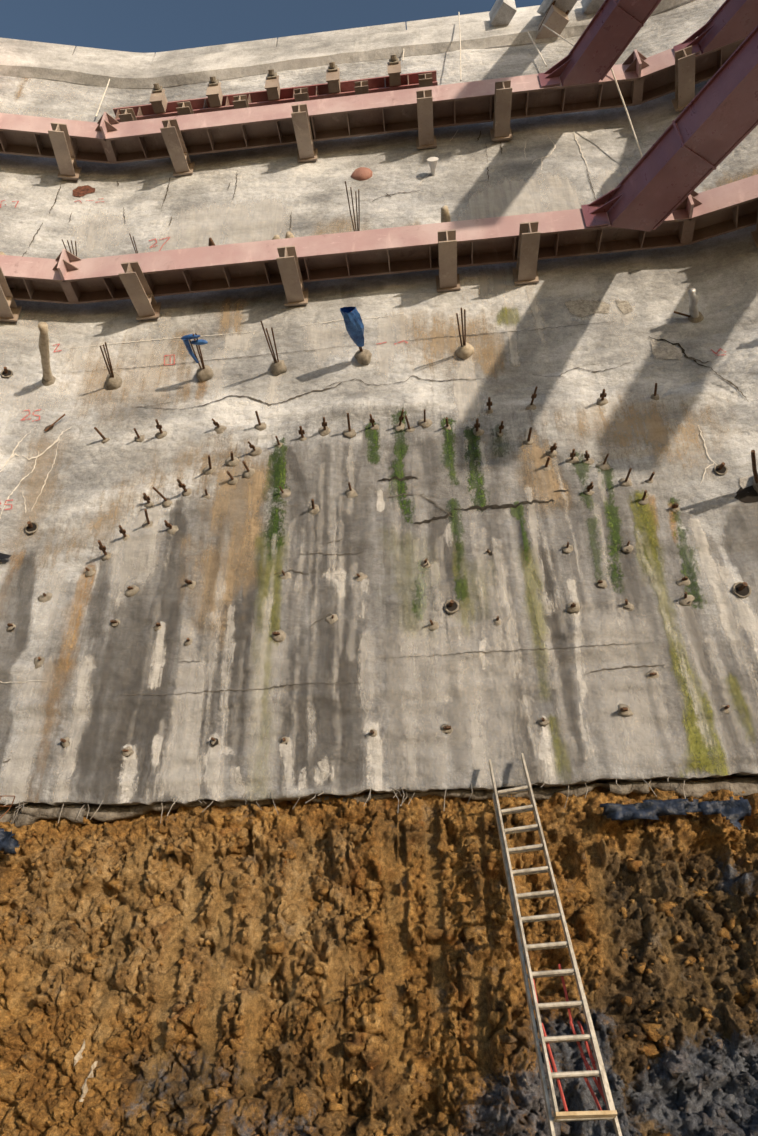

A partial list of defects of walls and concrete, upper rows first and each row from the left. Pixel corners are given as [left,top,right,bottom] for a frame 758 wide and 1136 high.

crack [137,375,481,410]
crack [650,337,753,401]
crack [378,476,568,525]
leakage [326,569,346,598]
leakage [691,518,758,658]
leakage [149,585,168,689]
leakage [528,552,593,751]
leakage [55,658,95,802]
leakage [118,744,137,804]
leakage [152,735,162,766]
leakage [279,616,385,791]
leakage [526,716,558,784]